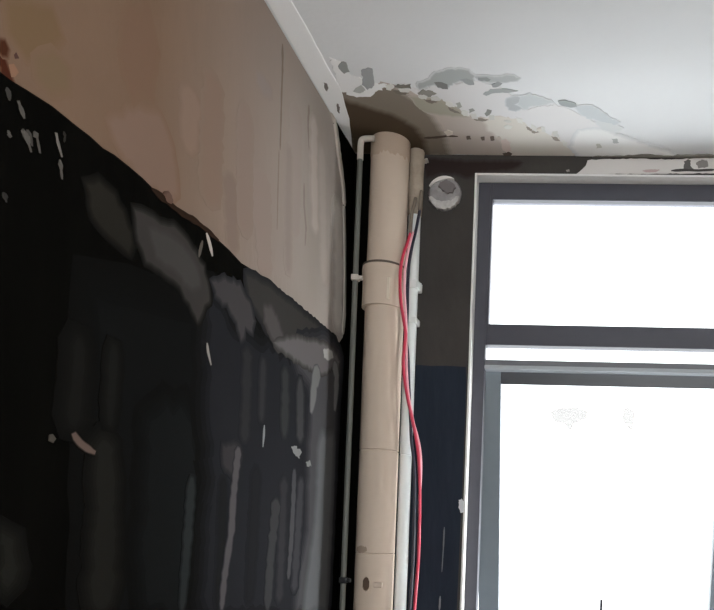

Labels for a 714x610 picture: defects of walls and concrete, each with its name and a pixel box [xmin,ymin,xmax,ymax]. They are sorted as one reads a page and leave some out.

leakage [342,81,524,180]
peeling [329,57,714,174]
leakage [50,66,344,610]
leakage [0,515,33,608]